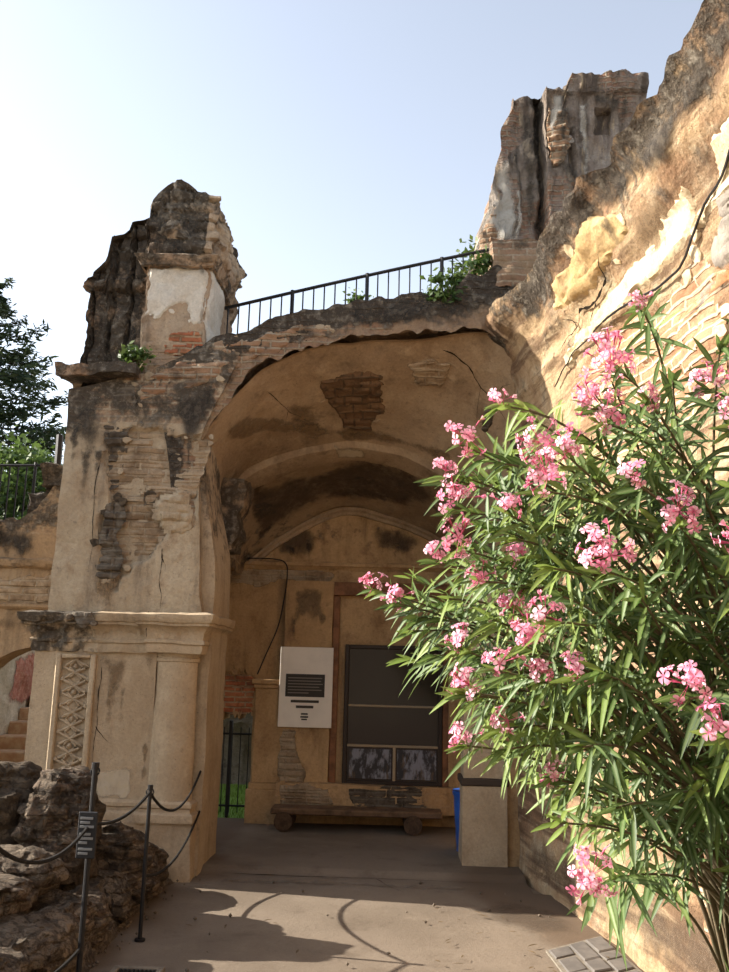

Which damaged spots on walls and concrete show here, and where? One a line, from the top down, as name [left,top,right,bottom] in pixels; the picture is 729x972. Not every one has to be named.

flaking render [546,108,574,166]
flaking render [472,204,505,276]
crack [561,254,606,348]
flaking render [551,118,729,470]
spalling [90,267,335,587]
spalling [315,371,385,431]
crack [443,350,510,432]
water stain [377,531,415,551]
peeling [0,570,51,604]